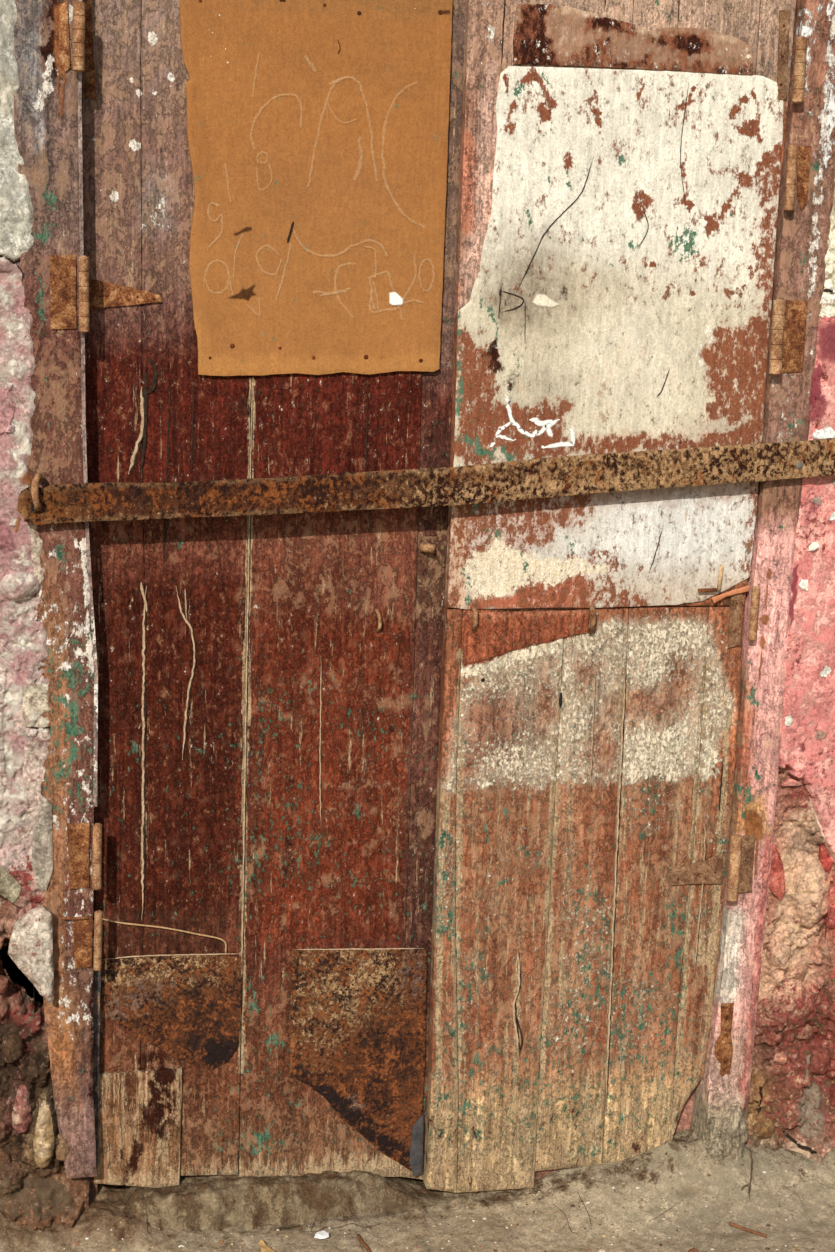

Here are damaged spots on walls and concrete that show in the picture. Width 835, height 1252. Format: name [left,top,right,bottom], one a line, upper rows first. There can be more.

corrosion [20,473,32,485]
peeling [15,677,53,890]
spalling [0,866,87,1231]
spalling [745,766,835,1162]